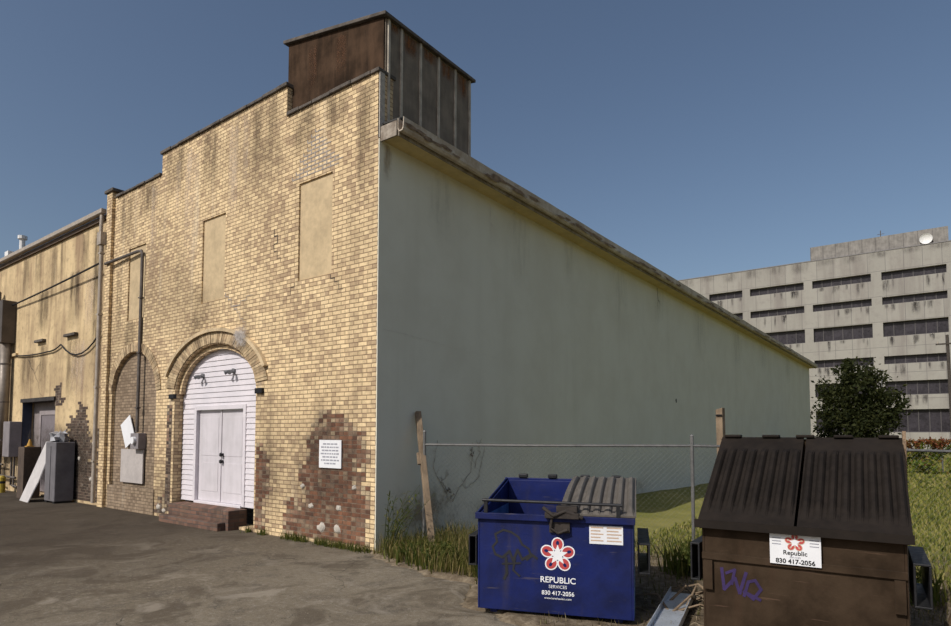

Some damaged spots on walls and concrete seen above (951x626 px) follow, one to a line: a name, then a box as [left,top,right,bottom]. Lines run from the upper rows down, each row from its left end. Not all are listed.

spalling [54,382,66,406]
spalling [66,401,99,503]
spalling [254,443,273,530]
spalling [282,409,371,547]